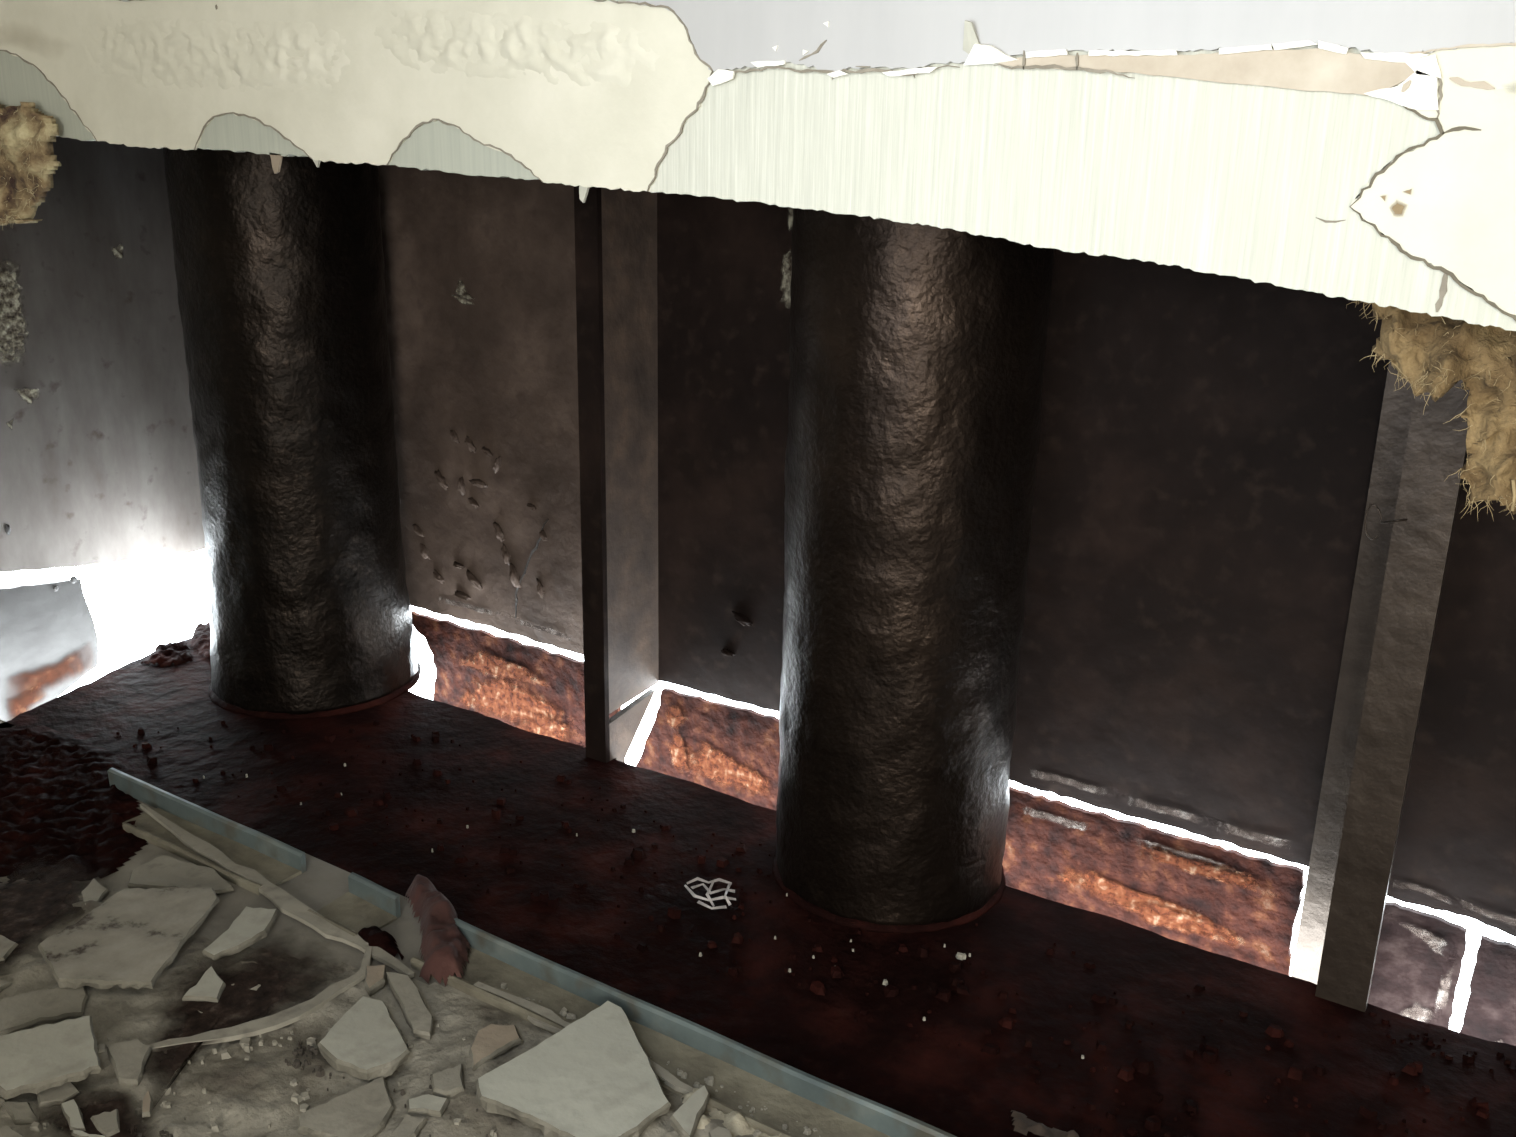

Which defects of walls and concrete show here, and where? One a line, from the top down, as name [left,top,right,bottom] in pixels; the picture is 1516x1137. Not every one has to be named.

peeling [0,0,713,192]
peeling [751,46,786,68]
peeling [882,67,937,76]
peeling [963,20,1018,65]
crack [1316,78,1516,322]
rust [460,651,571,742]
rust [665,706,769,796]
rust [1057,869,1243,946]
rust [1141,842,1265,896]